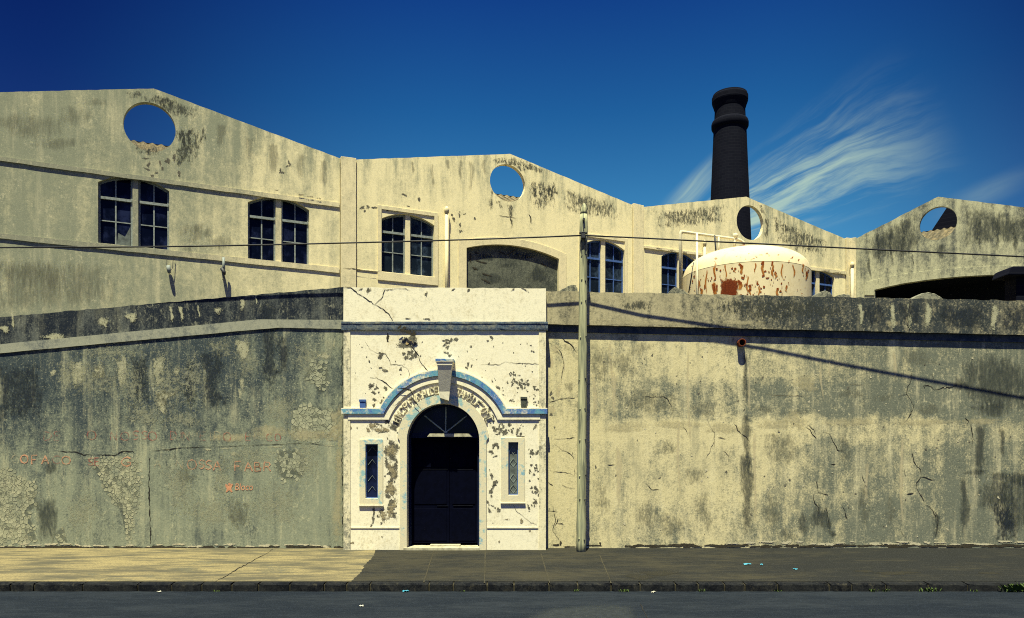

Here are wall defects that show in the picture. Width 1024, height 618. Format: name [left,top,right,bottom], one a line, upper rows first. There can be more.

leakage [176,129,206,165]
leakage [498,158,613,217]
leakage [659,205,724,227]
crack [347,268,406,319]
rust [690,253,809,296]
leakage [58,297,324,425]
spalling [366,318,430,375]
crack [901,373,954,425]
peeling [350,387,434,537]
leakage [708,417,756,524]
crack [905,454,938,536]
leakage [956,360,1024,539]